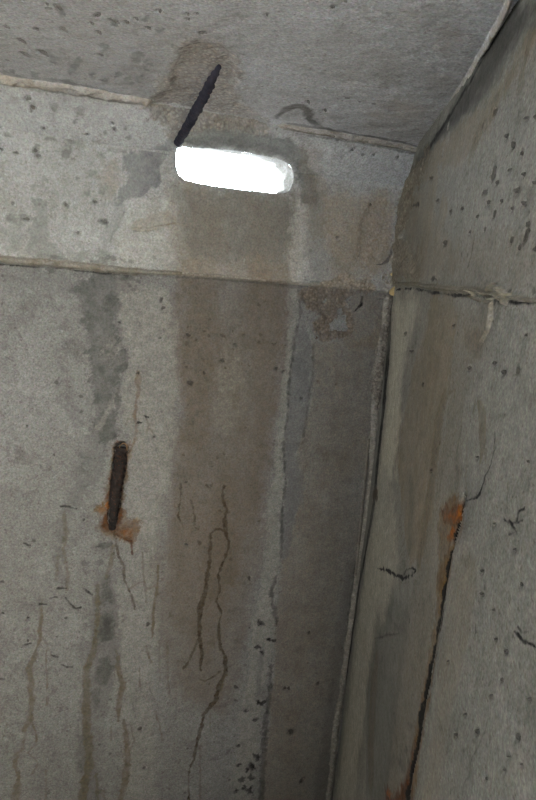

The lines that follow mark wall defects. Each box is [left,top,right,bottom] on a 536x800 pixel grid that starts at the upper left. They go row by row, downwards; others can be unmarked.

spalling [296,187,396,347]
leakage [354,0,536,295]
corrosion [79,369,160,611]
leakage [0,130,510,800]
crack [344,310,417,699]
crack [384,430,496,800]